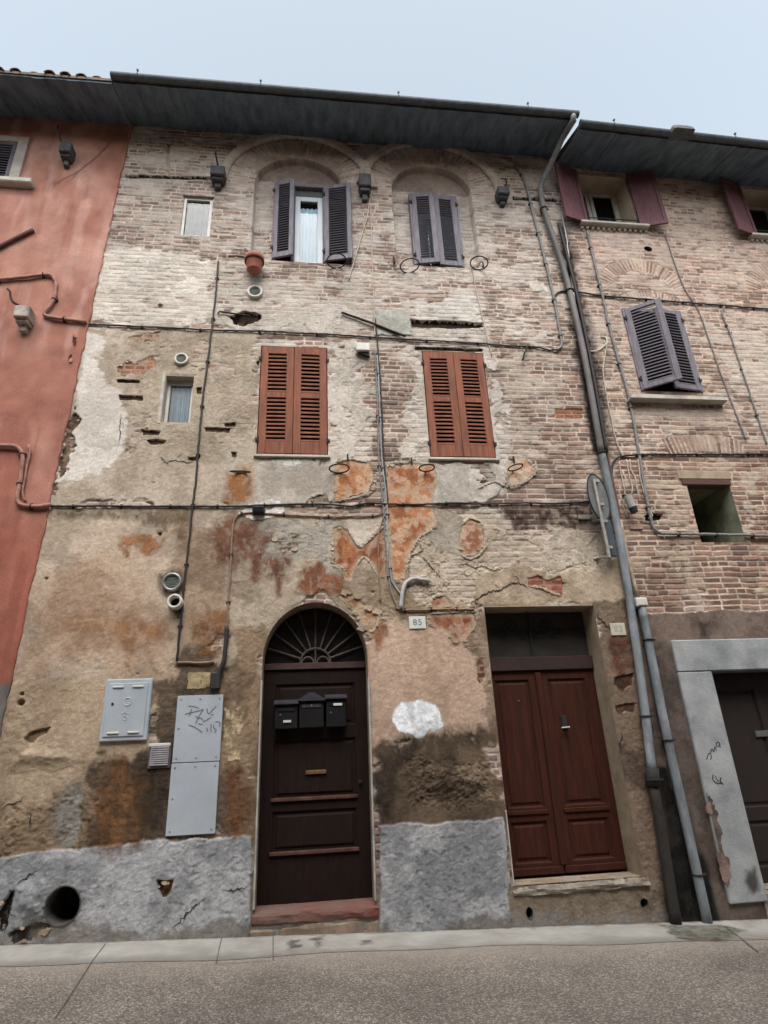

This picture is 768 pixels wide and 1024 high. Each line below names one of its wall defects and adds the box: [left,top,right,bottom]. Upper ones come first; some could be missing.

spalling [230,311,261,327]
spalling [117,356,156,401]
spalling [59,407,82,478]
peeling [479,456,538,490]
peeling [305,457,438,634]
crack [418,554,528,604]
spalling [614,673,635,715]
water stain [373,727,482,821]
peeling [705,793,732,888]
spalling [0,890,51,944]
spalling [157,880,173,897]
crack [172,886,248,928]